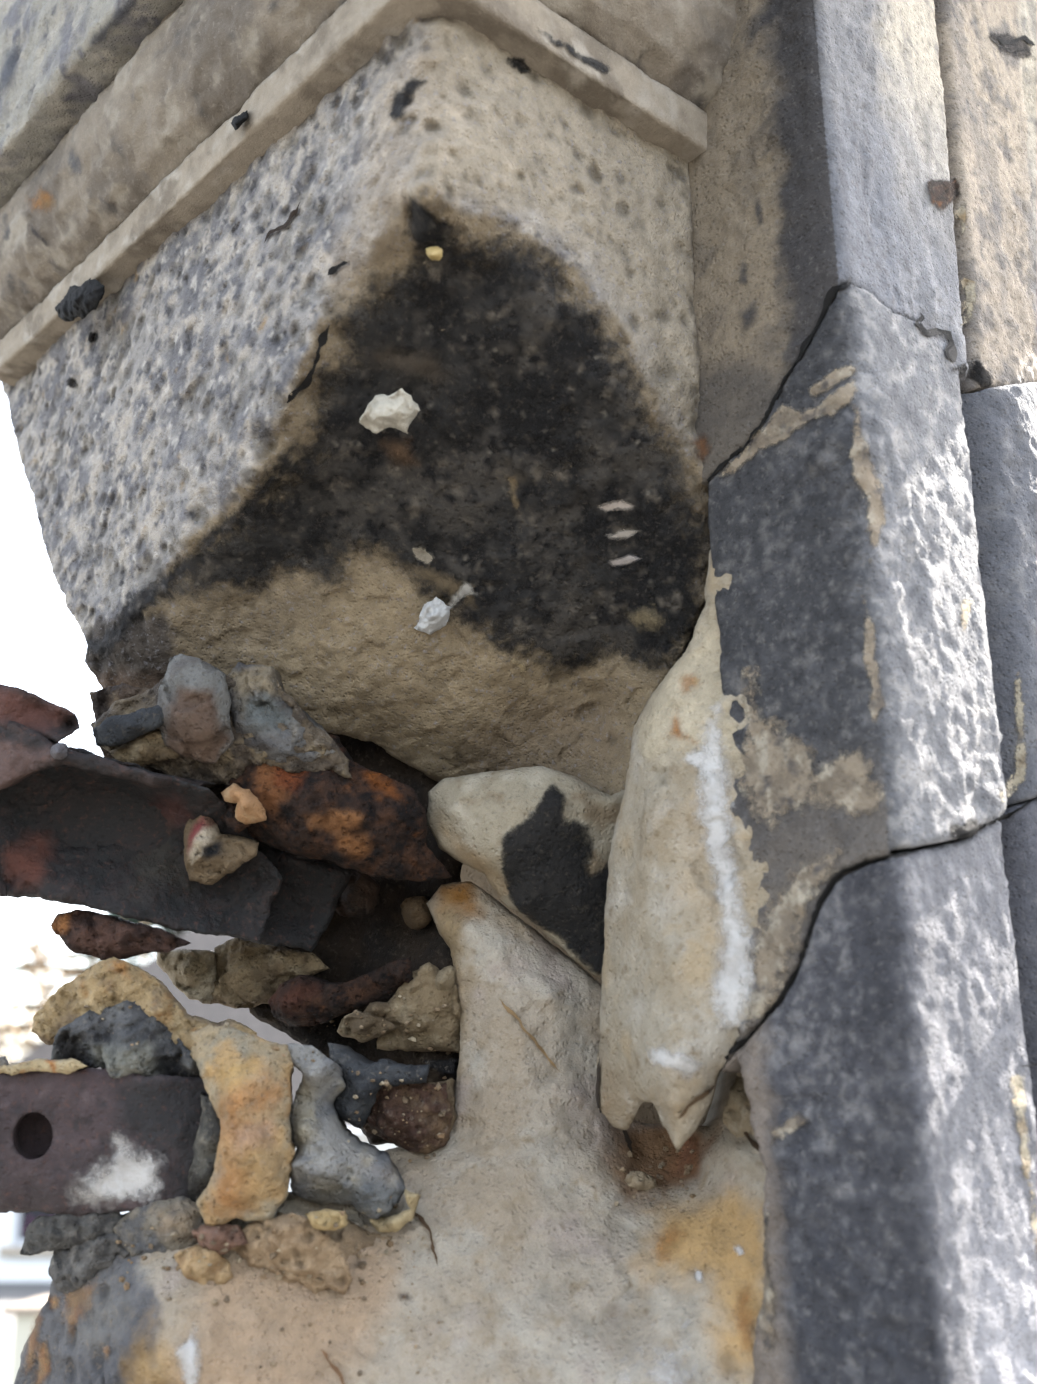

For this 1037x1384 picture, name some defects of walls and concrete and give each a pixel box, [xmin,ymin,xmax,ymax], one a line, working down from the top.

crack [707,282,851,483]
crack [915,313,958,362]
rust [51,909,190,960]
spalling [92,705,164,747]
rust [221,797,251,833]
leakage [686,705,754,1025]
crack [595,549,1037,1152]
spalling [14,881,805,1384]